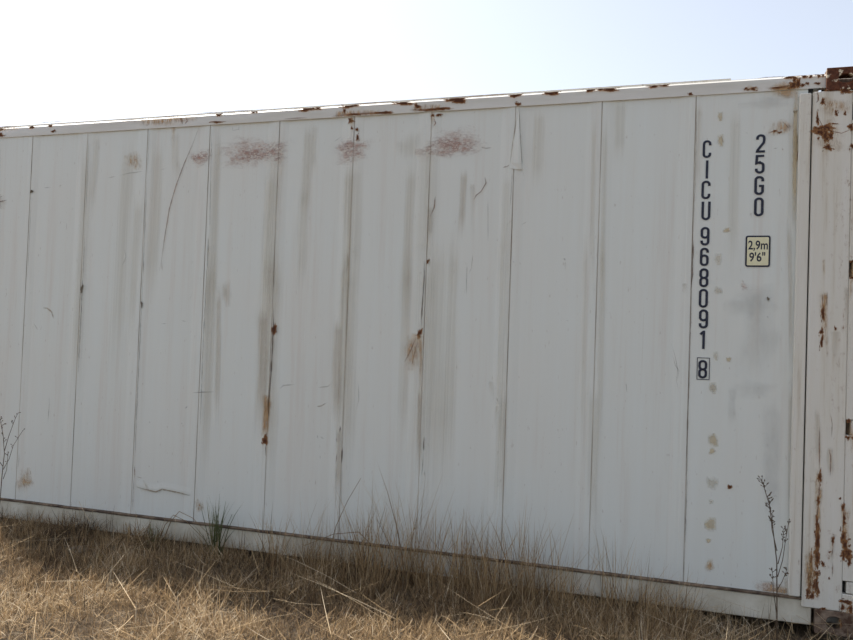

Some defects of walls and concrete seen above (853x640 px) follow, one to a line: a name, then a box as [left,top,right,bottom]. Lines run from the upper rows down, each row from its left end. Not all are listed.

rust [338,94,522,140]
rust [764,74,853,151]
rust [261,322,277,452]
rust [806,433,853,599]
rust [839,598,853,627]